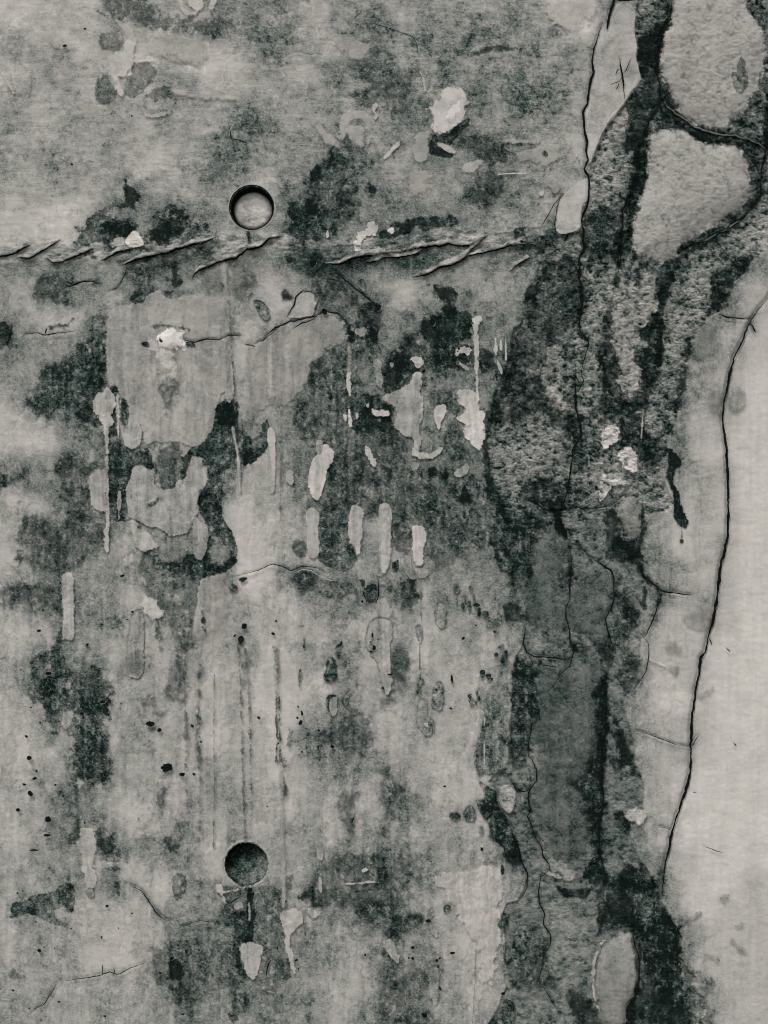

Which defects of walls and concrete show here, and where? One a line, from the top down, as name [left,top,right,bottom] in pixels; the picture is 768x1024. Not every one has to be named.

leakage [0,453,121,896]
leakage [26,310,107,427]
crack [68,268,127,291]
spalling [108,386,269,592]
crack [183,272,377,347]
spalling [291,440,357,571]
peeling [365,446,377,467]
peeling [366,339,447,459]
crack [511,0,633,1023]
leakage [543,31,768,1024]
crack [634,298,768,900]
leakage [432,836,556,1024]